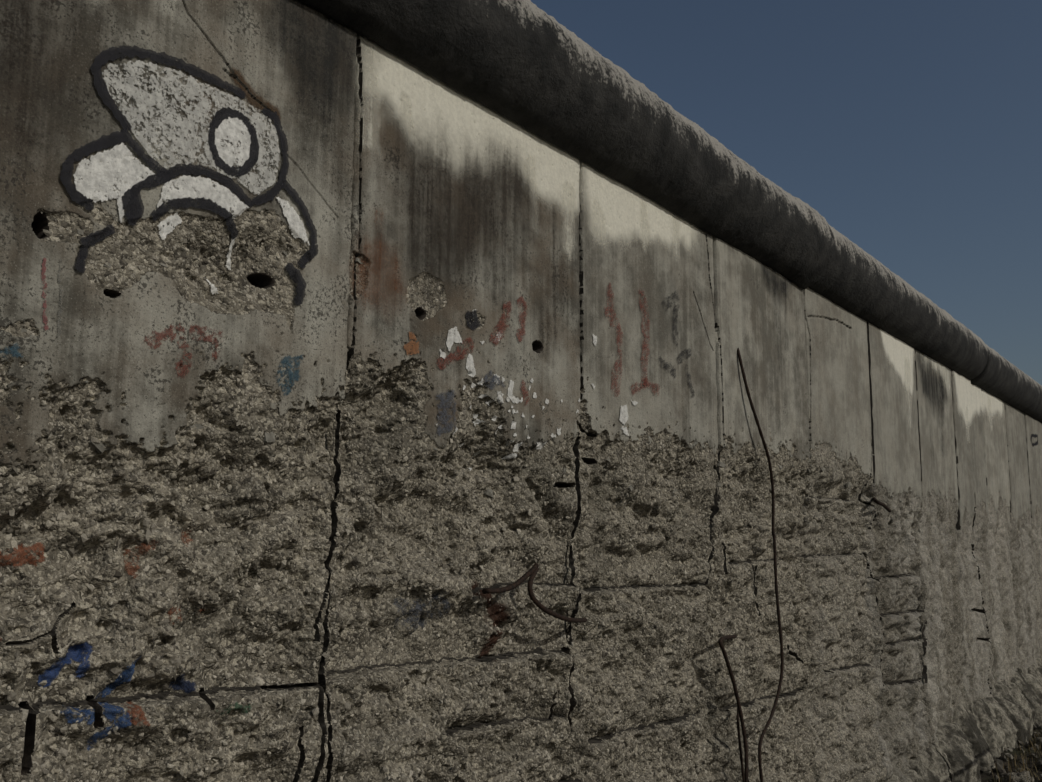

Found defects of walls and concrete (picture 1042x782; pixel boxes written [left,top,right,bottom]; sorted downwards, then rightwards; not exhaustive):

spalling [37,200,311,330]
crack [260,39,363,782]
spalling [349,250,371,298]
spalling [405,272,447,321]
water stain [273,0,699,269]
spalling [0,309,1042,782]
crack [565,205,598,645]